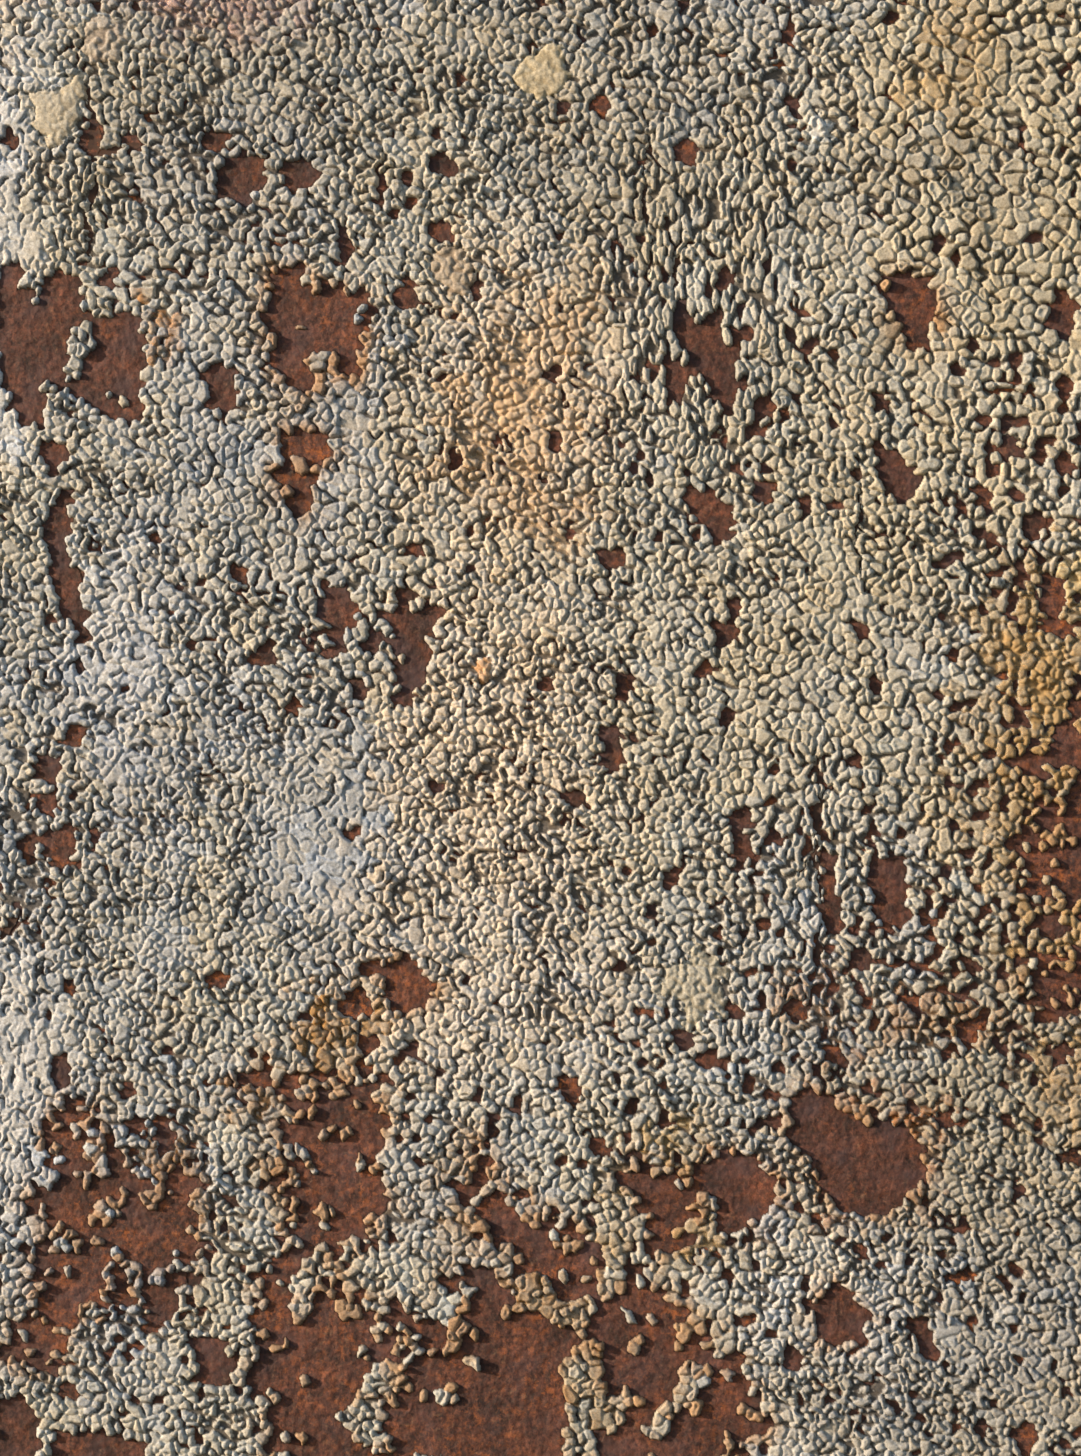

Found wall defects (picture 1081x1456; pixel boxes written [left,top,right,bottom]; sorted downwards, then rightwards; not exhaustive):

crack [83,91,141,262]
crack [641,108,693,295]
peeling [777,32,1081,505]
peeling [599,126,1081,739]
crack [854,458,875,592]
peeling [520,653,674,816]
corrosion [985,615,1081,790]
crack [0,915,19,940]
crack [799,759,832,959]
peeling [797,685,1081,1087]
corrosion [302,995,328,1072]
peeling [0,931,1081,1456]